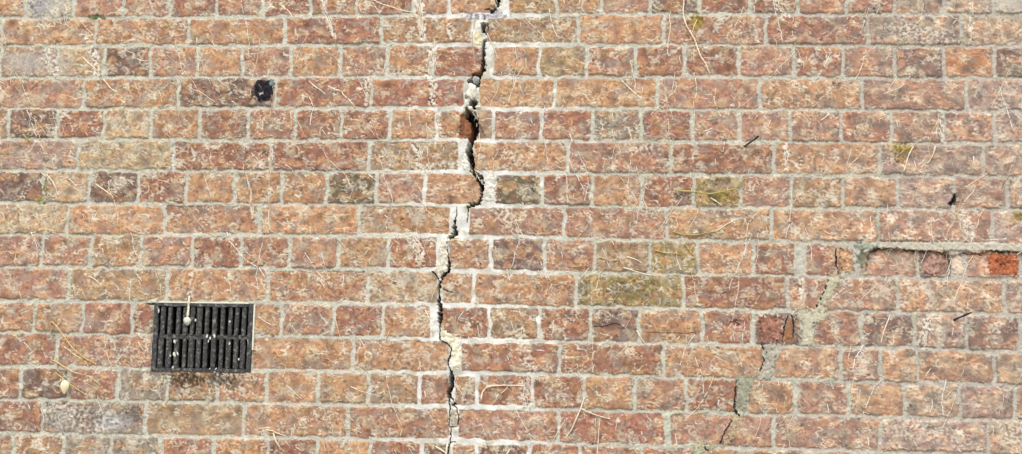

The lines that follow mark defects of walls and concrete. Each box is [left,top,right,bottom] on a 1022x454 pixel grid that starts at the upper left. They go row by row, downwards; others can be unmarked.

crack [431,0,501,453]
crack [691,248,845,454]
crack [871,247,1017,256]